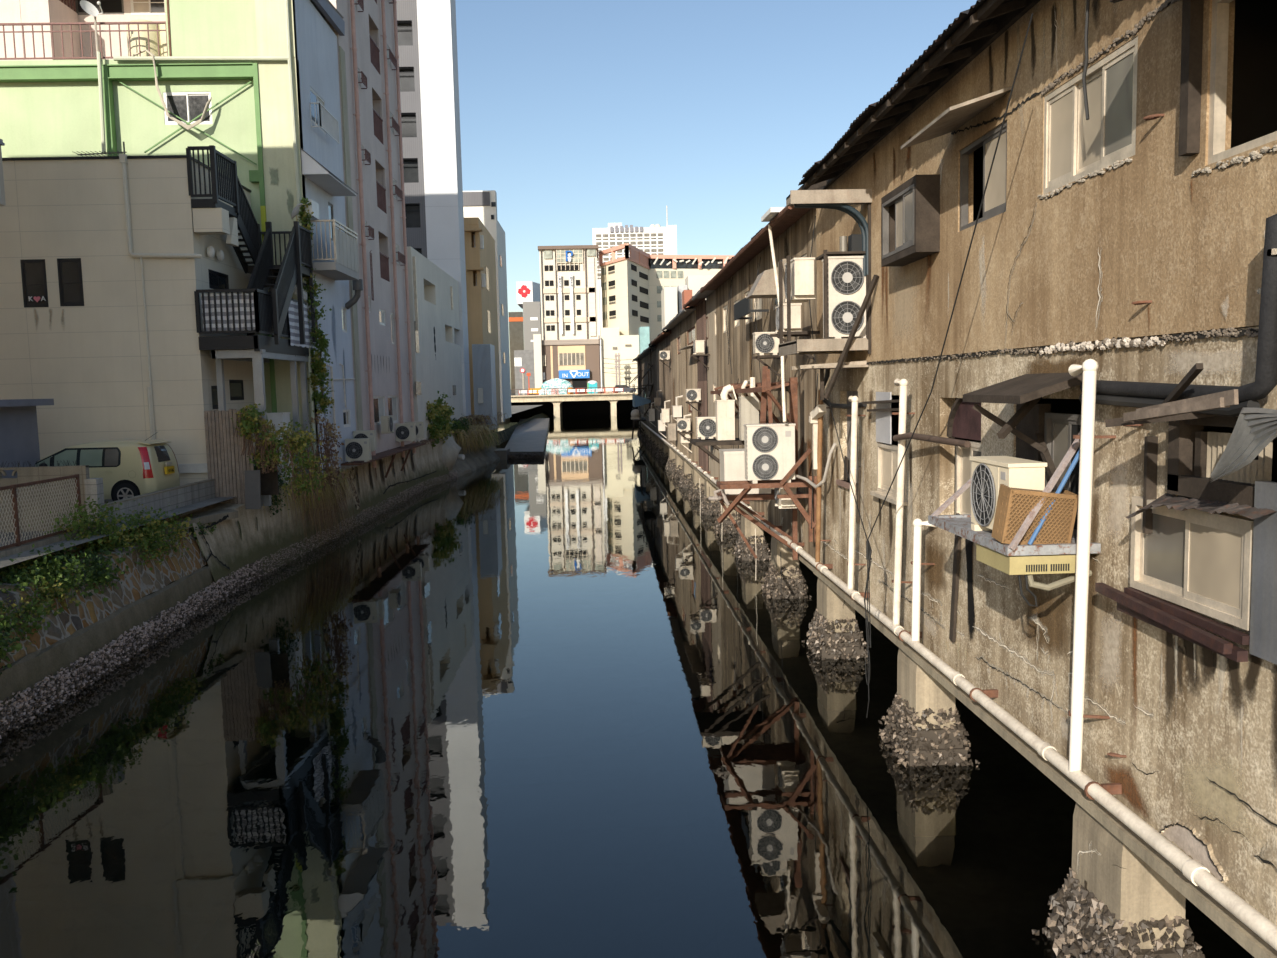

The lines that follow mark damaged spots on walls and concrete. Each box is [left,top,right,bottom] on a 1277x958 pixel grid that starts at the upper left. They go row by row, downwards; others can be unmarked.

leakage [989,0,1099,92]
leakage [1161,631,1277,771]
crack [1195,779,1277,854]